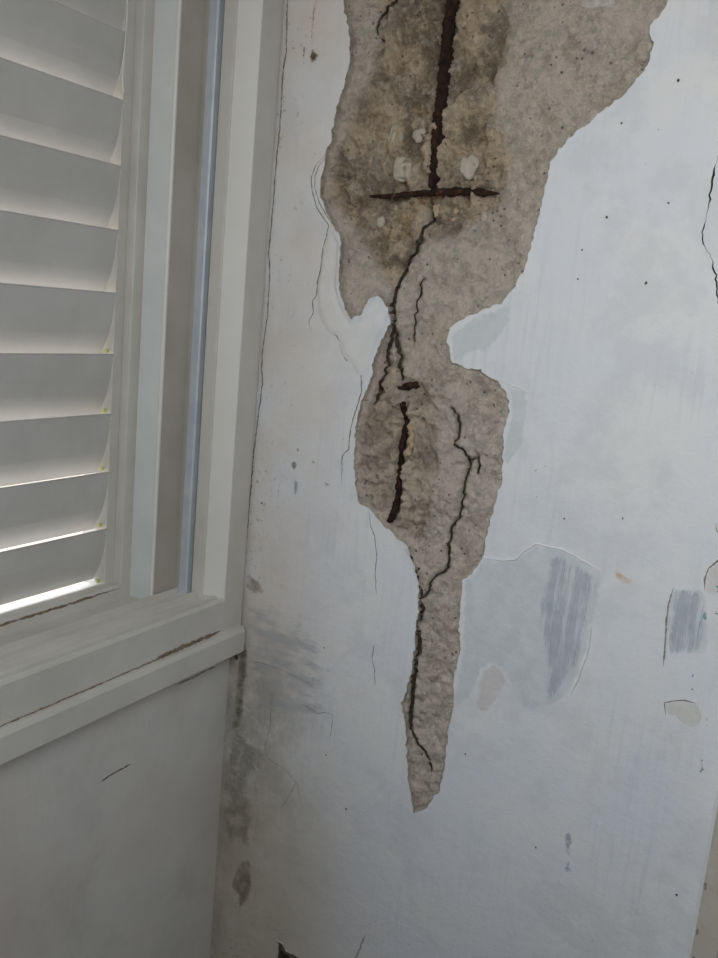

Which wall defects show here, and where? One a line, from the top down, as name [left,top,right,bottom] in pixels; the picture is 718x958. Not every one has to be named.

crack [406,407,481,772]
spalling [319,0,668,814]
crack [701,157,718,298]
spalling [275,940,298,958]